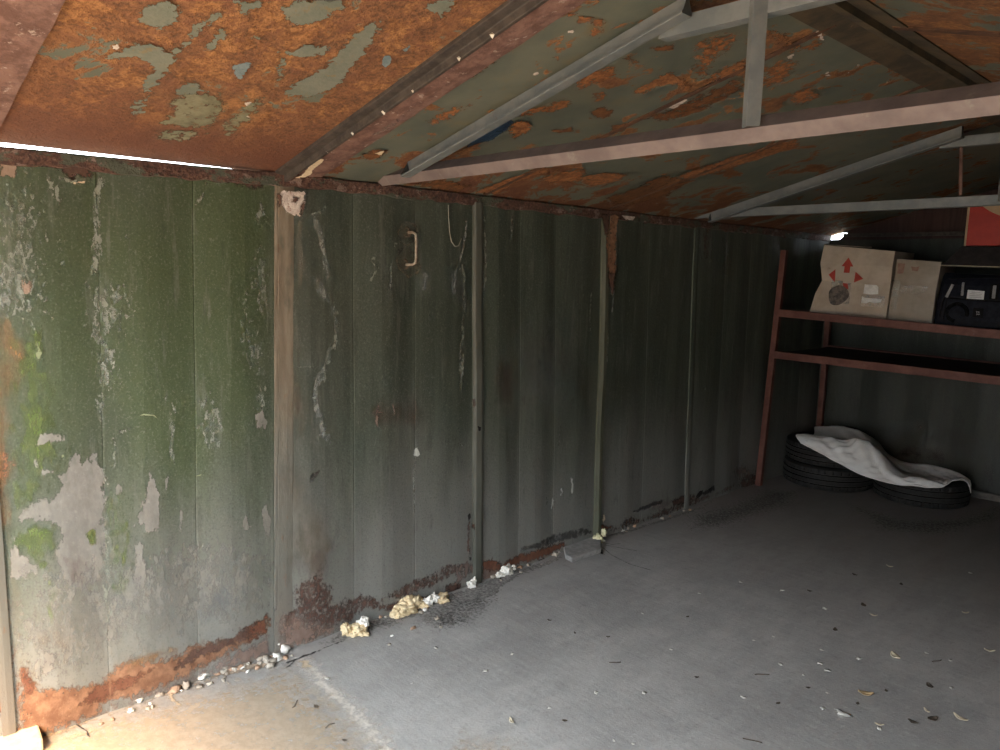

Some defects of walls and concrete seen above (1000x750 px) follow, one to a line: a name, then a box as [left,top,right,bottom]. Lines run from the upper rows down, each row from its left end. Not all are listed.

peeling [105,13,227,115]
peeling [233,0,346,27]
peeling [275,21,382,98]
rust [634,33,746,121]
damp [47,177,77,202]
damp [90,178,104,275]
efflorescence [311,200,329,298]
rust [416,167,627,194]
rust [602,139,800,294]
efflorescence [298,306,340,442]
peeling [10,428,276,681]
rust [16,495,697,733]